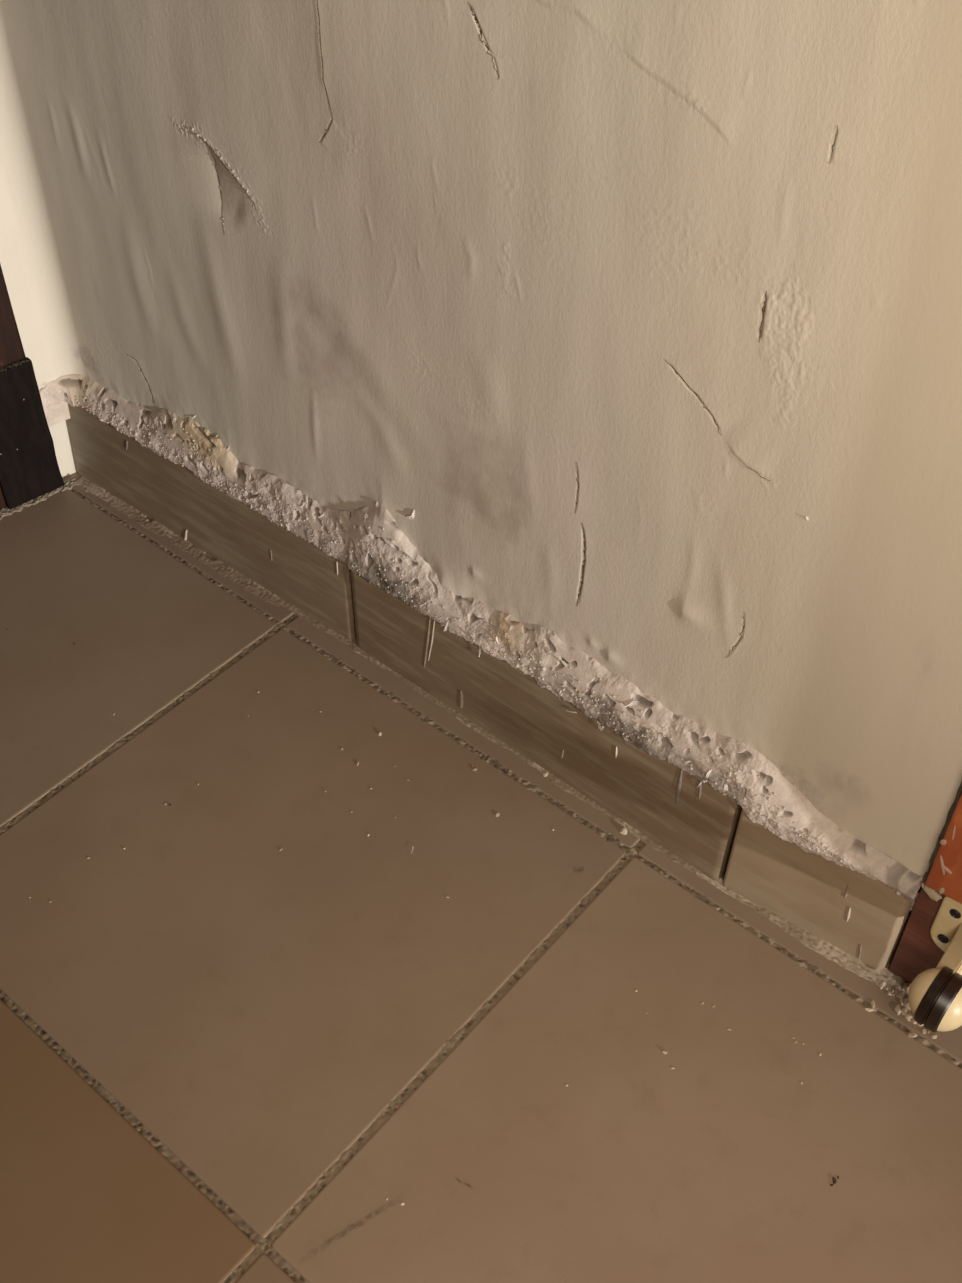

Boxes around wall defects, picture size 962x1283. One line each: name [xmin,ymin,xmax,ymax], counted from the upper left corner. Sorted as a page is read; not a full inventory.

flaking render [169,113,272,255]
crack [312,0,338,150]
crack [463,0,504,88]
crack [822,117,846,172]
crack [657,351,779,489]
crack [570,456,589,611]
spalling [38,375,923,911]